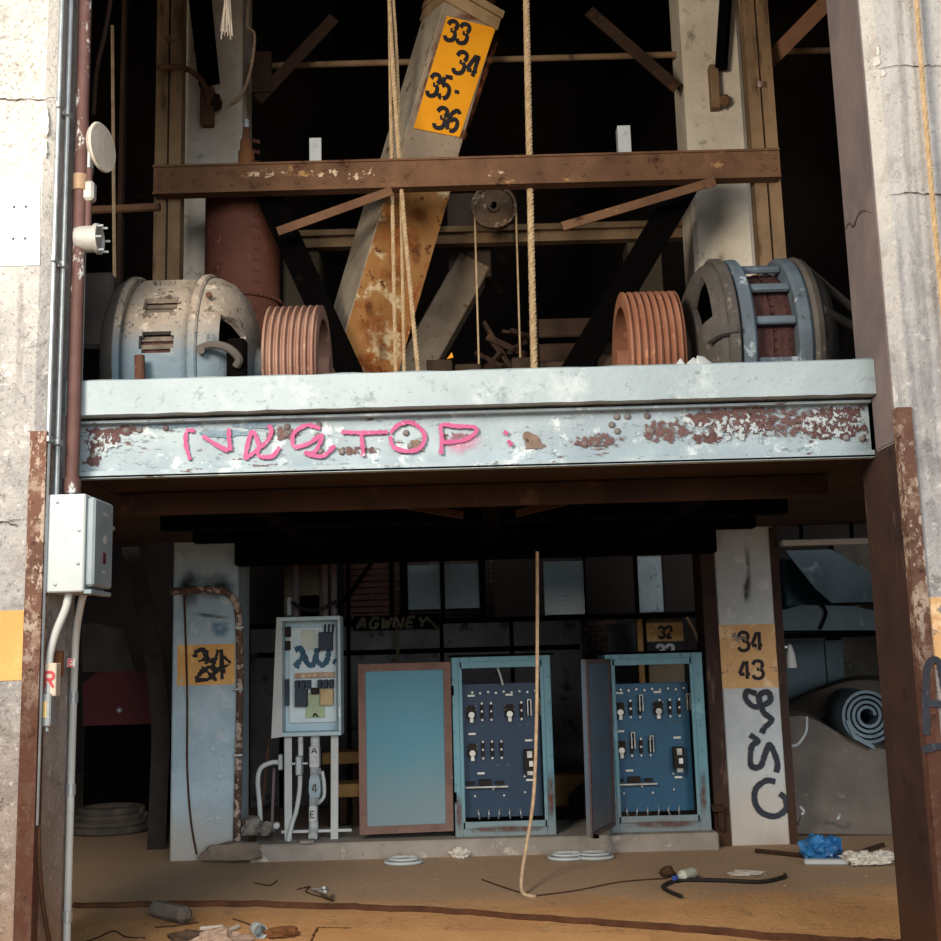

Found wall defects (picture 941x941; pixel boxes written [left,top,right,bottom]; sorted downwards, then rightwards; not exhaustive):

crack [0,95,62,103]
crack [845,210,869,229]
peeling [635,402,869,445]
peeling [82,420,300,466]
peeling [329,446,380,455]
peeling [564,433,624,448]